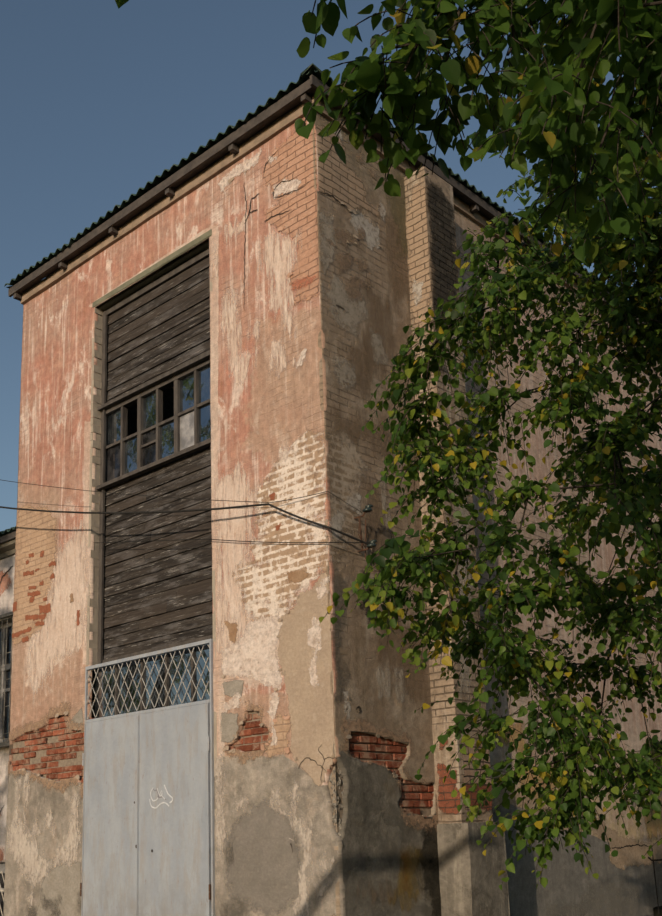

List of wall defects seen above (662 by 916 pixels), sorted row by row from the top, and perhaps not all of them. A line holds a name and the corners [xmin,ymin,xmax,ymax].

peeling [211,215,247,278]
flaking render [218,125,386,338]
peeling [221,288,259,384]
peeling [270,341,307,377]
peeling [0,504,89,693]
peeling [213,430,552,829]
spalling [8,702,95,799]
leakage [215,756,234,861]
leakage [270,784,335,916]
crack [298,744,333,776]
flaking render [571,813,662,870]